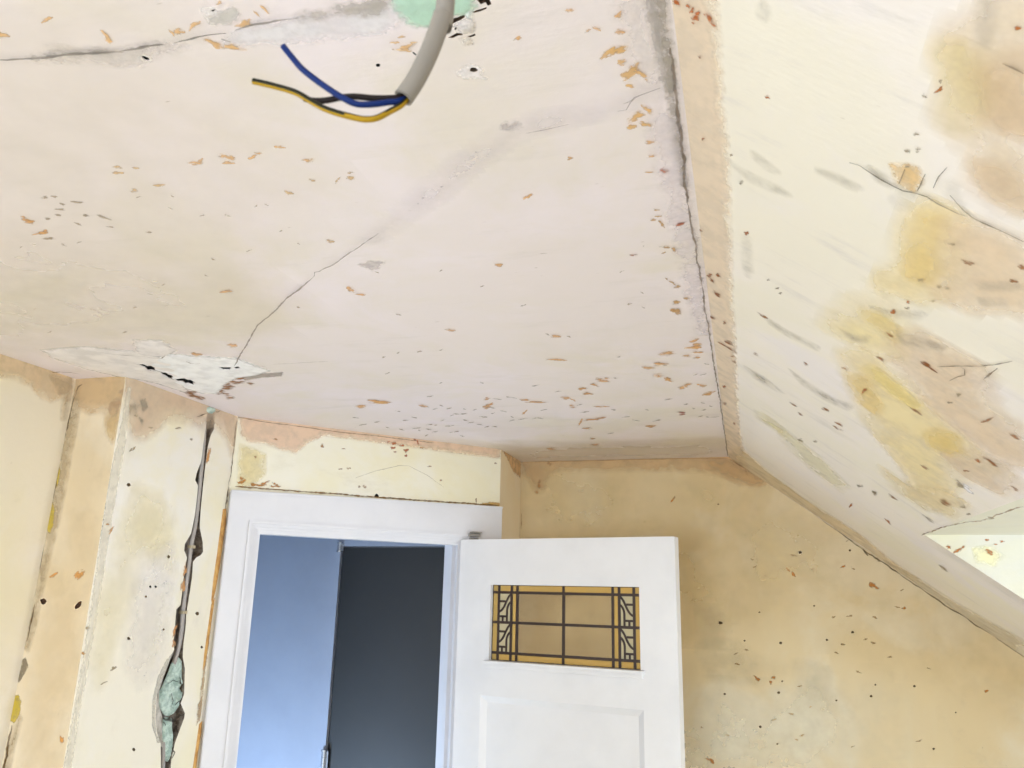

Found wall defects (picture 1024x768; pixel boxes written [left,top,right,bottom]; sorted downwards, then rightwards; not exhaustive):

crack [3,18,296,61]
water stain [890,165,920,191]
crack [849,162,1024,242]
crack [234,235,376,366]
crack [622,48,749,471]
water stain [881,209,1024,307]
spalling [42,340,268,400]
water stain [854,340,1024,510]
crack [825,522,1024,657]
crack [163,678,184,758]